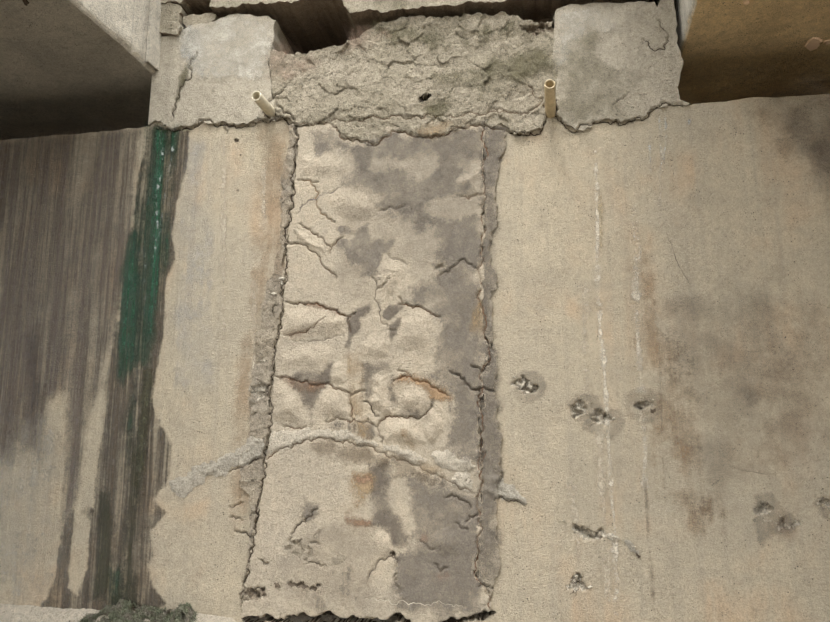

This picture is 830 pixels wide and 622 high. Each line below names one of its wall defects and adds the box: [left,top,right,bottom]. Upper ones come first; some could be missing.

spalling [519,23,553,36]
leakage [314,129,492,464]
crack [156,59,673,622]
leakage [0,128,189,611]
spalling [511,376,539,395]
spalling [570,399,615,427]
spalling [634,398,656,413]
leakage [369,460,390,497]
leakage [371,473,481,614]
spalling [559,519,640,558]
spalling [244,579,321,601]
spalling [566,574,593,595]